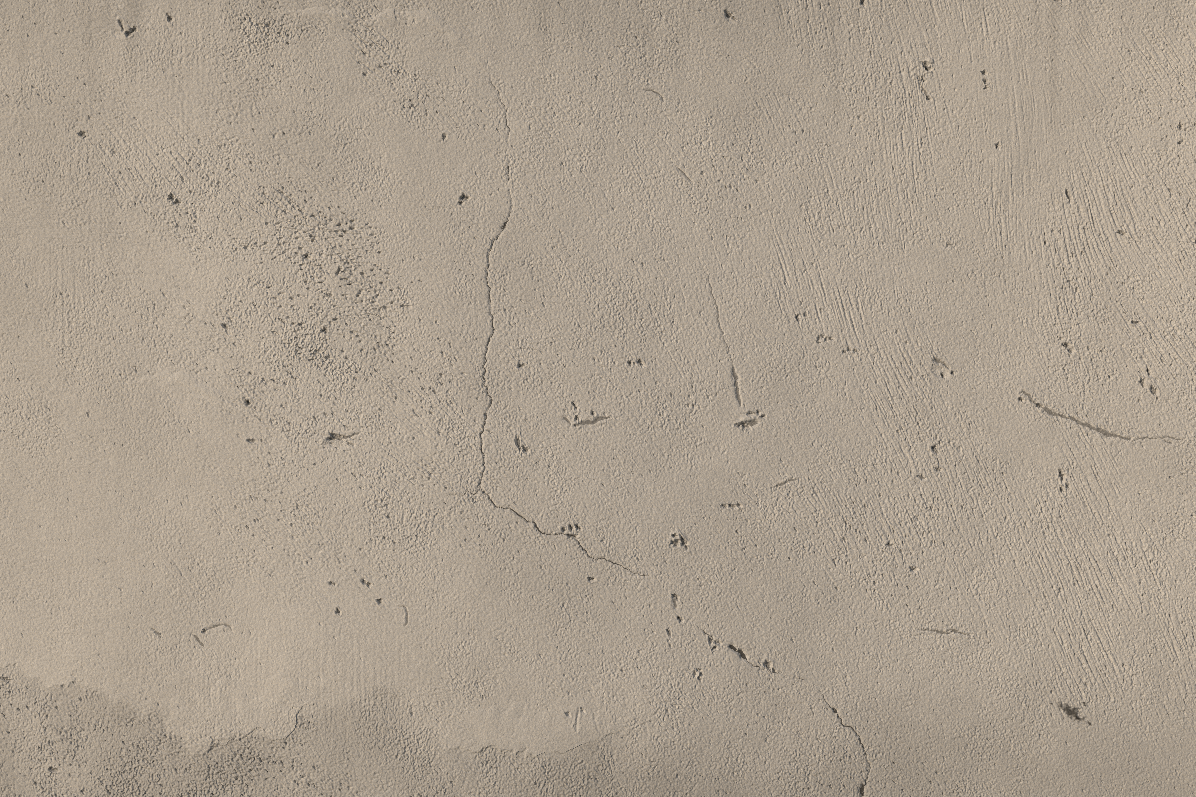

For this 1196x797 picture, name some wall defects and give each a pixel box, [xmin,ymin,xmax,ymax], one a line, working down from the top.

crack [455,212,649,576]
crack [701,629,870,796]